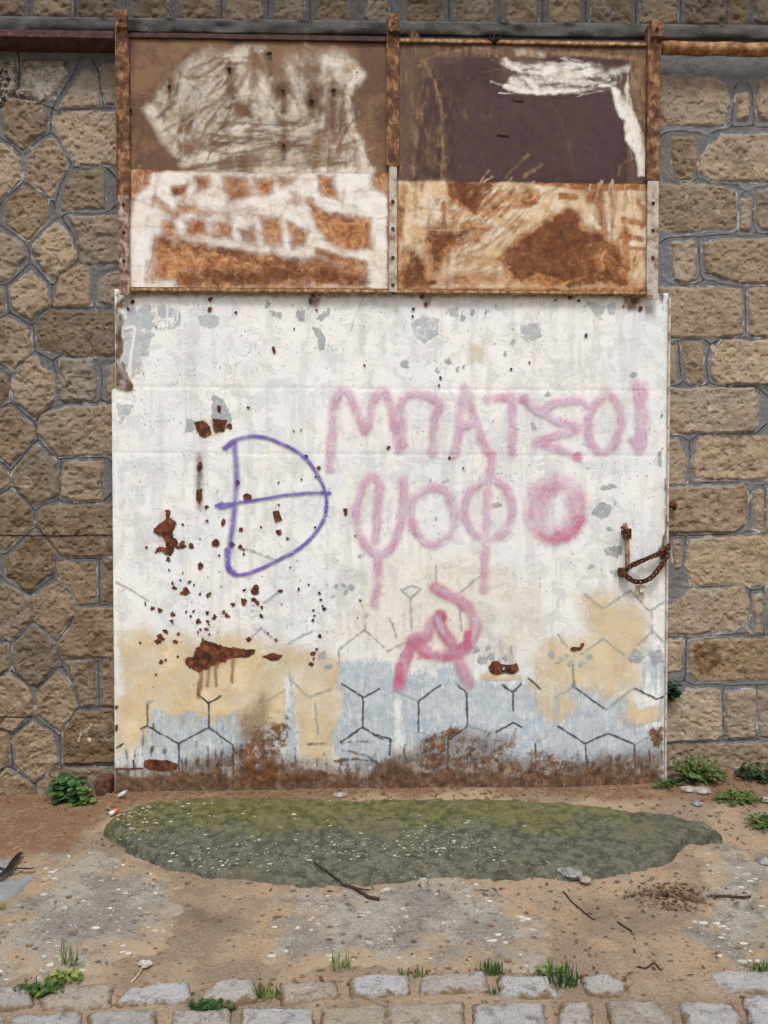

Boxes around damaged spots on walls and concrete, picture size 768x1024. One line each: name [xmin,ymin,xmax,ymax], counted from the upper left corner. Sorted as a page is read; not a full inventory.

peeling [122,47,653,379]
corrosion [449,181,491,213]
corrosion [404,230,469,297]
corrosion [505,210,642,309]
corrosion [115,247,386,391]
corrosion [194,405,232,438]
corrosion [153,509,194,562]
corrosion [618,523,632,578]
corrosion [185,640,283,698]
corrosion [114,702,664,792]